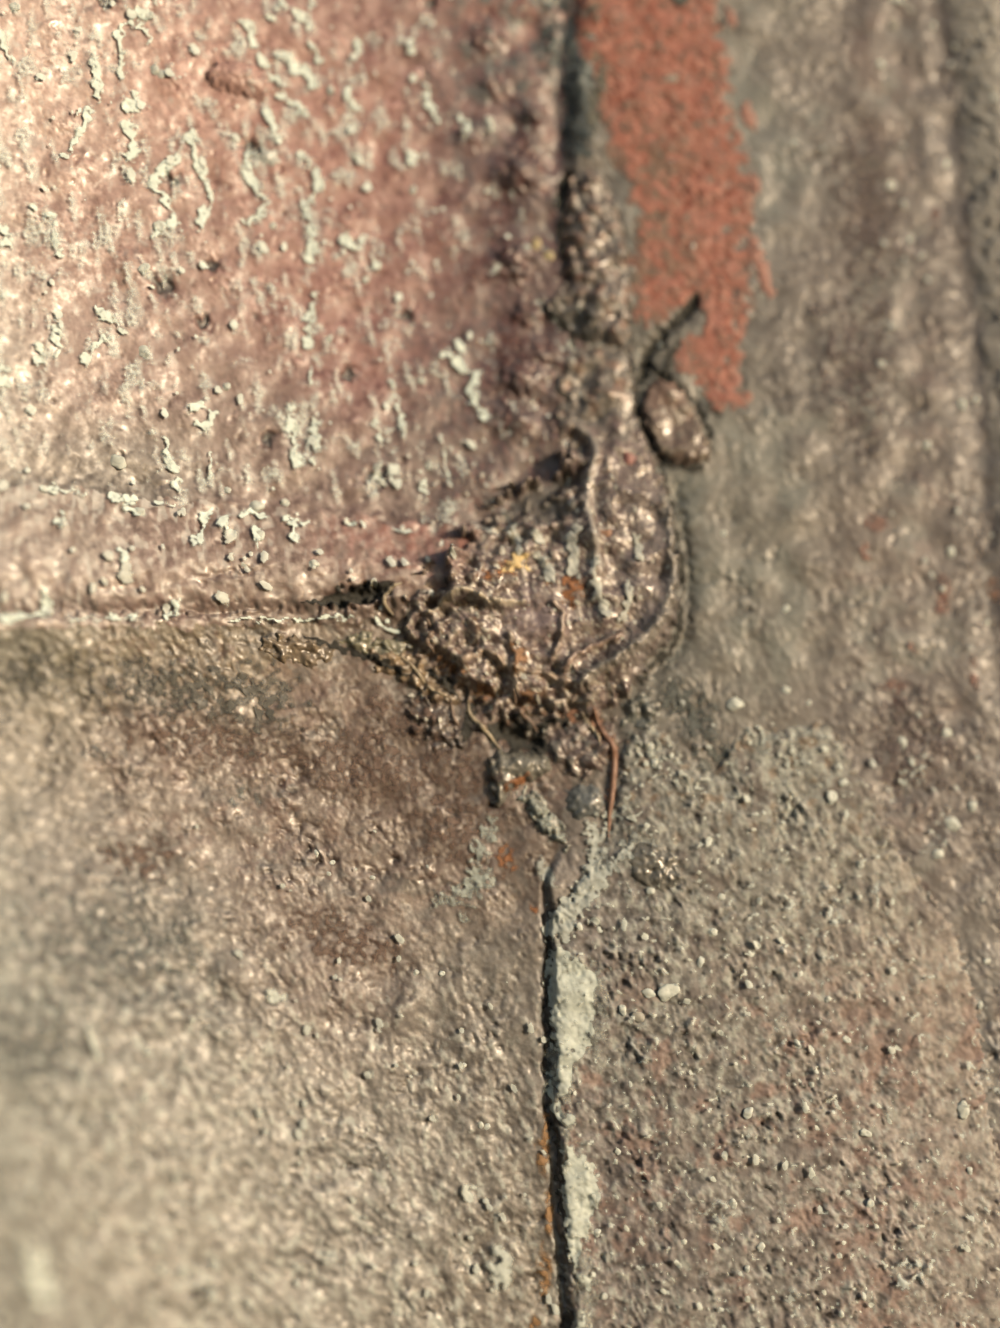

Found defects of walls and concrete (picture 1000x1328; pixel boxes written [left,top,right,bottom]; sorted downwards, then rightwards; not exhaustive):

water stain [113,0,157,160]
water stain [238,0,324,145]
water stain [148,128,214,238]
peeling [571,0,776,468]
water stain [440,339,491,421]
water stain [108,491,141,515]
water stain [154,436,183,507]
water stain [285,403,322,468]
corrosion [537,1112,550,1172]
crack [540,903,582,1328]
water stain [537,805,657,1328]
corrosion [545,1192,554,1234]